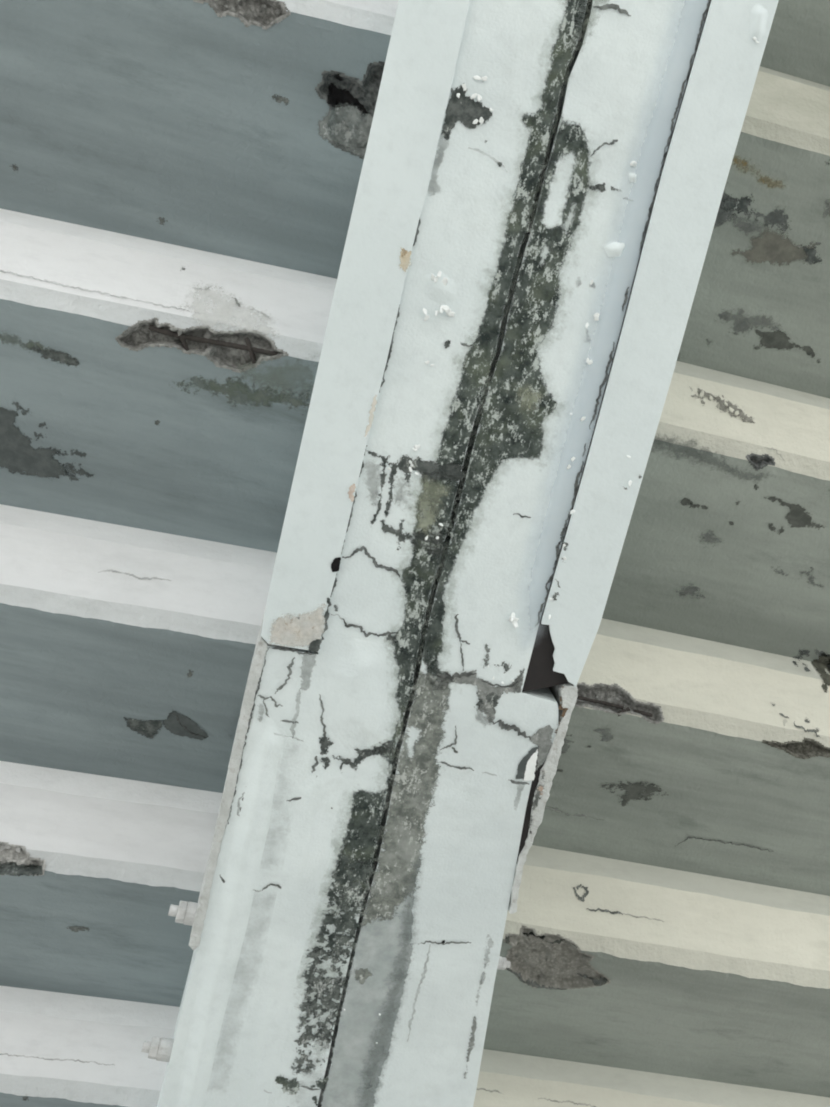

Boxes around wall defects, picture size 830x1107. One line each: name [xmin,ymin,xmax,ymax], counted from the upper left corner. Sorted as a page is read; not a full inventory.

spalling [315,61,385,159]
crack [640,0,711,254]
damp [0,335,79,366]
spalling [115,317,289,373]
damp [177,377,310,409]
crack [537,342,615,624]
damp [275,0,631,1107]
crack [227,445,400,824]
crack [435,614,531,771]
spalling [575,682,664,724]
spalling [762,737,830,759]
spalling [503,925,611,990]